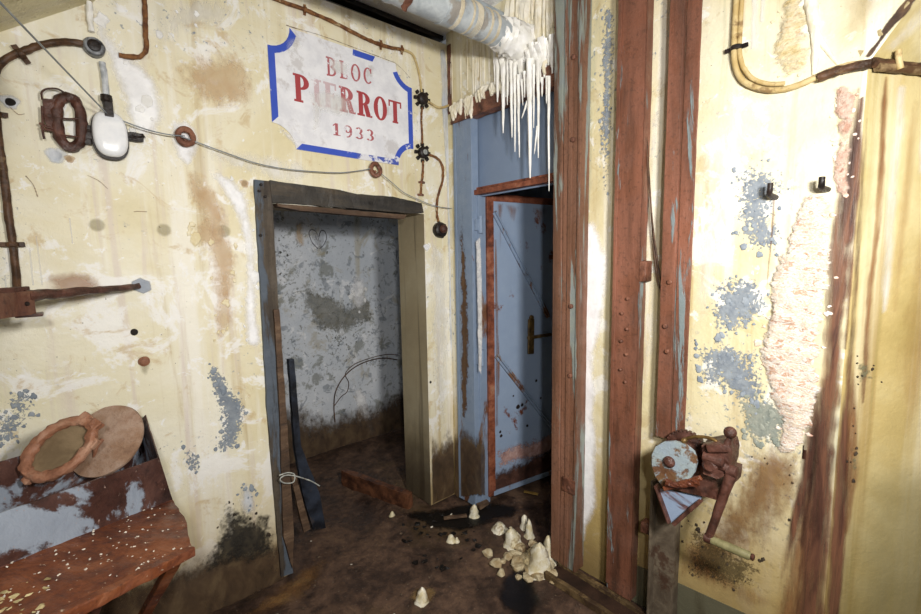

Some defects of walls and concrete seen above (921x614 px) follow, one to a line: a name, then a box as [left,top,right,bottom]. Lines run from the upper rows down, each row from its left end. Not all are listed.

spalling [770,0,808,78]
spalling [830,86,861,198]
rust [878,85,886,202]
peeling [0,389,40,448]
peeling [207,363,249,452]
damp [287,390,404,464]
rust [460,230,470,418]
rust [496,433,552,490]
spalling [694,158,839,453]
rust [784,97,879,614]
damp [99,576,159,614]
damp [152,501,284,614]